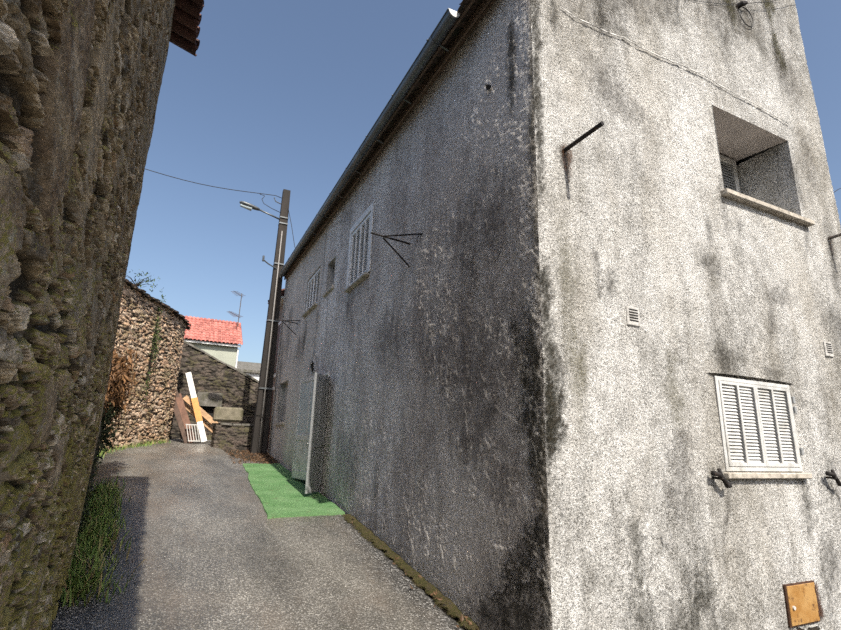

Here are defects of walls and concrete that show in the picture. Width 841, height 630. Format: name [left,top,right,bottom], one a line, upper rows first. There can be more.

water stain [506,22,515,109]
water stain [772,32,787,74]
water stain [527,0,544,247]
rust [562,144,573,181]
water stain [511,258,567,627]